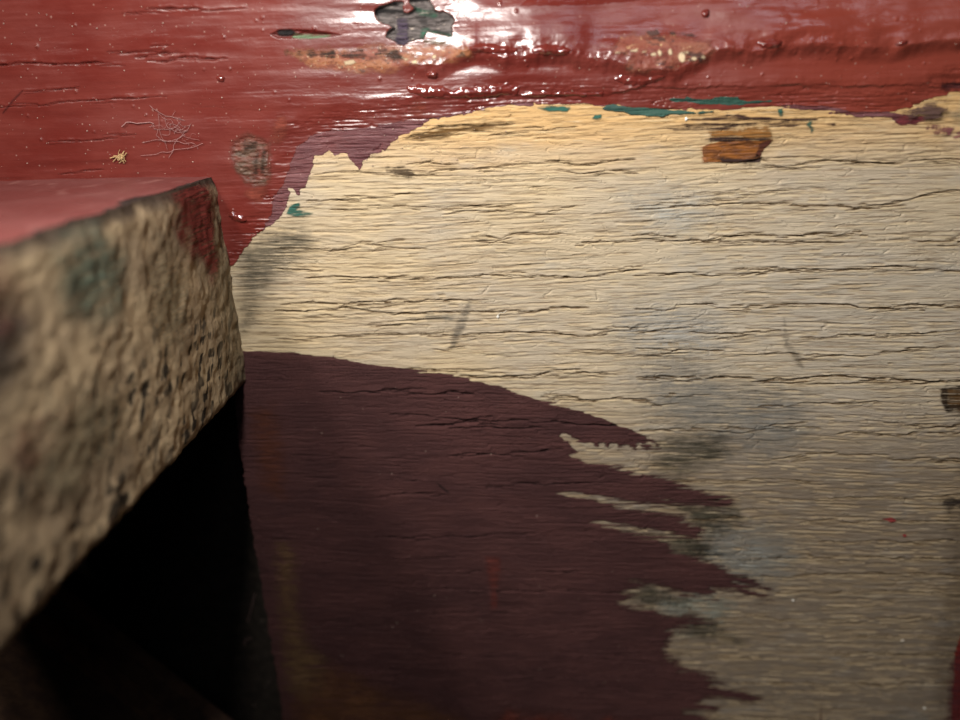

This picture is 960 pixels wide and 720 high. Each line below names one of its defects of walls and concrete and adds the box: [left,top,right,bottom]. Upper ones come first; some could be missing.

peeling [270,0,471,73]
peeling [232,135,269,185]
crack [308,123,960,246]
peeling [703,126,772,163]
peeling [904,103,948,121]
crack [272,239,960,594]